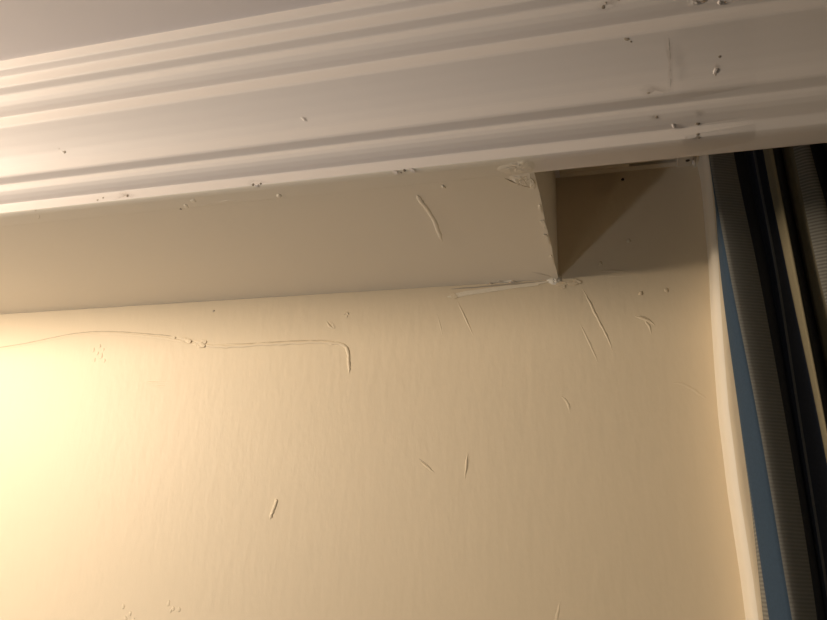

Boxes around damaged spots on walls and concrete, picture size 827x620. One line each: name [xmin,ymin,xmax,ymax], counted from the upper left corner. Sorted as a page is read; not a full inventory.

crack [0,331,351,374]